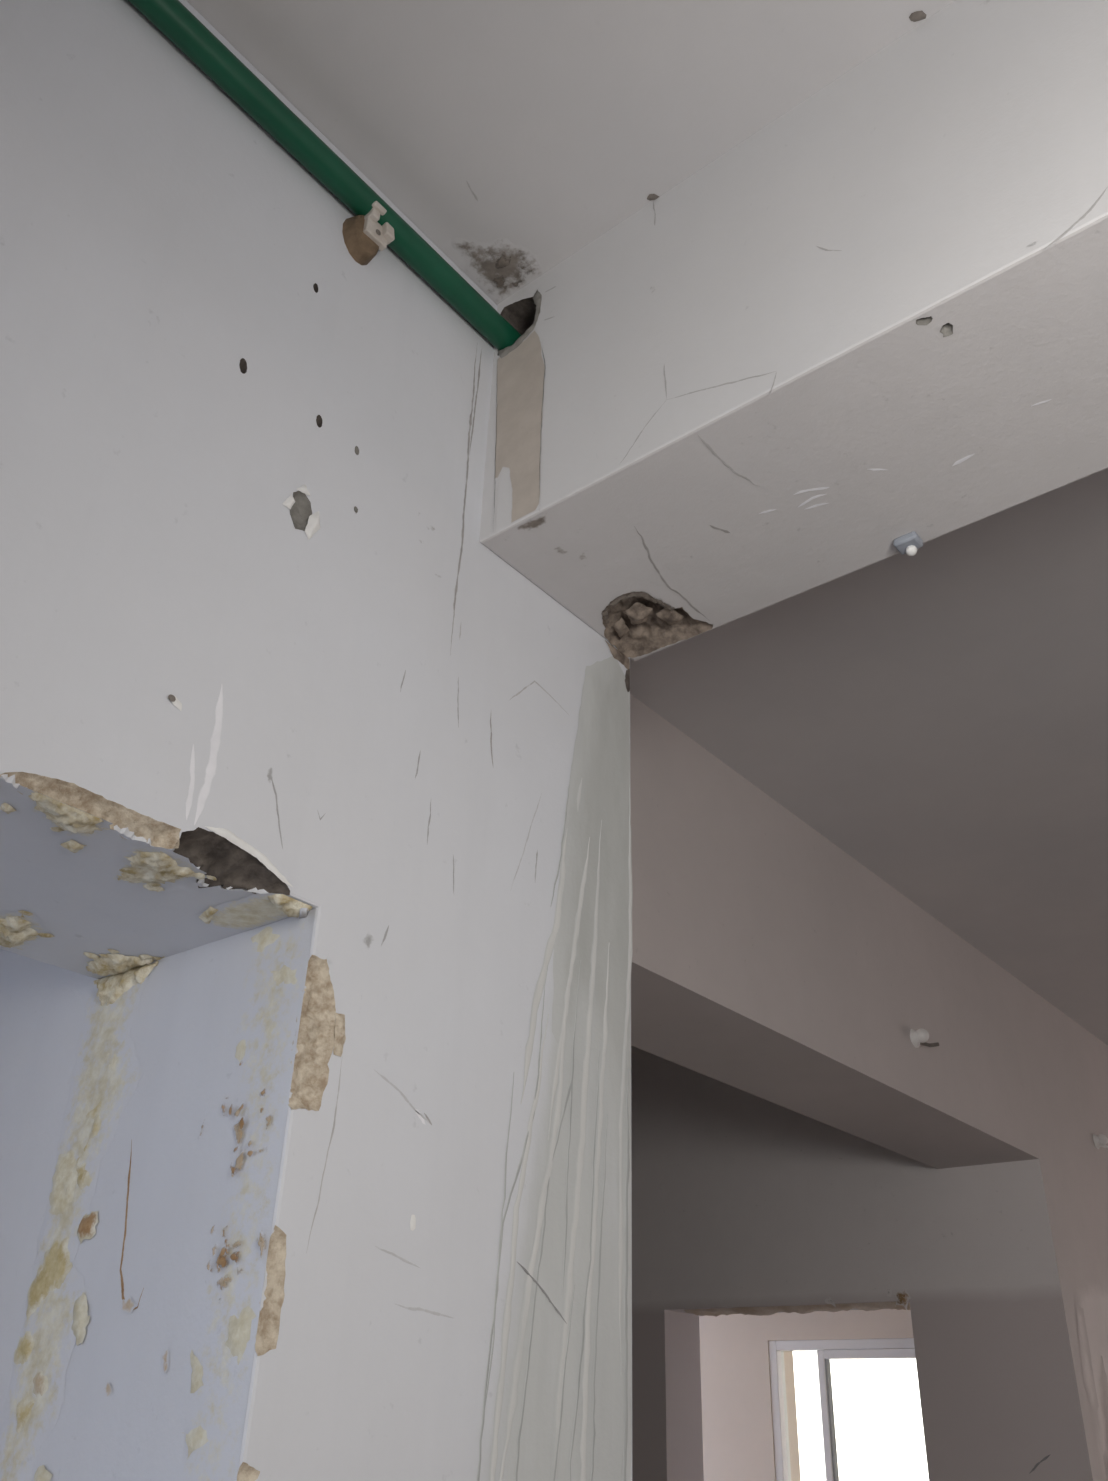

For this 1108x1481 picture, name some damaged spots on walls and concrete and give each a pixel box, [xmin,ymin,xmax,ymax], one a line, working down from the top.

peeling [167,694,182,711]
spalling [0,772,293,895]